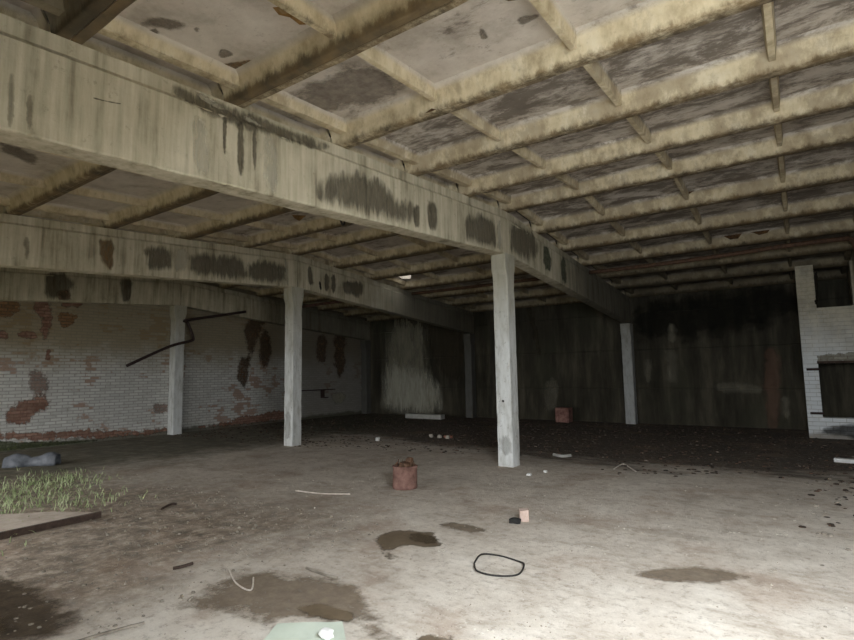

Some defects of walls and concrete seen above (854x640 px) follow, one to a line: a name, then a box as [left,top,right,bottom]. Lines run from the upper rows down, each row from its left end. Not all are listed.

water stain [297,66,399,111]
water stain [0,142,36,163]
water stain [175,88,327,175]
water stain [318,170,437,229]
water stain [46,273,74,300]
water stain [191,252,285,283]
flaking render [0,301,83,360]
water stain [383,318,464,414]
flaking render [0,369,168,442]
flaking render [198,410,284,428]